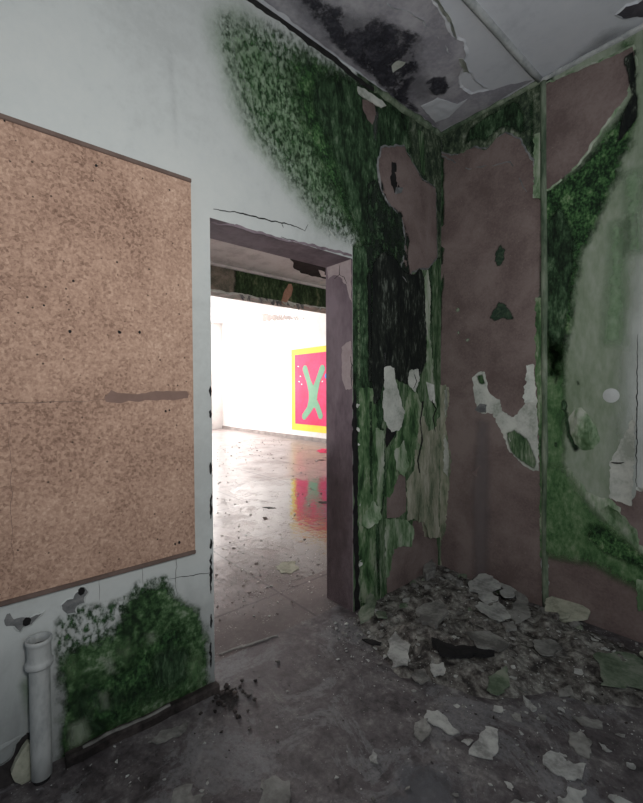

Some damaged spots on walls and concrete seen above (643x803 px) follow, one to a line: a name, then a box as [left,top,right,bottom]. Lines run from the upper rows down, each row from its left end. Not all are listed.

spalling [264,0,532,131]
spalling [615,0,643,20]
crack [215,209,308,240]
leakage [303,0,643,498]
spalling [341,45,643,698]
leakage [373,419,416,601]
spalling [4,610,46,632]
spalling [60,586,89,615]